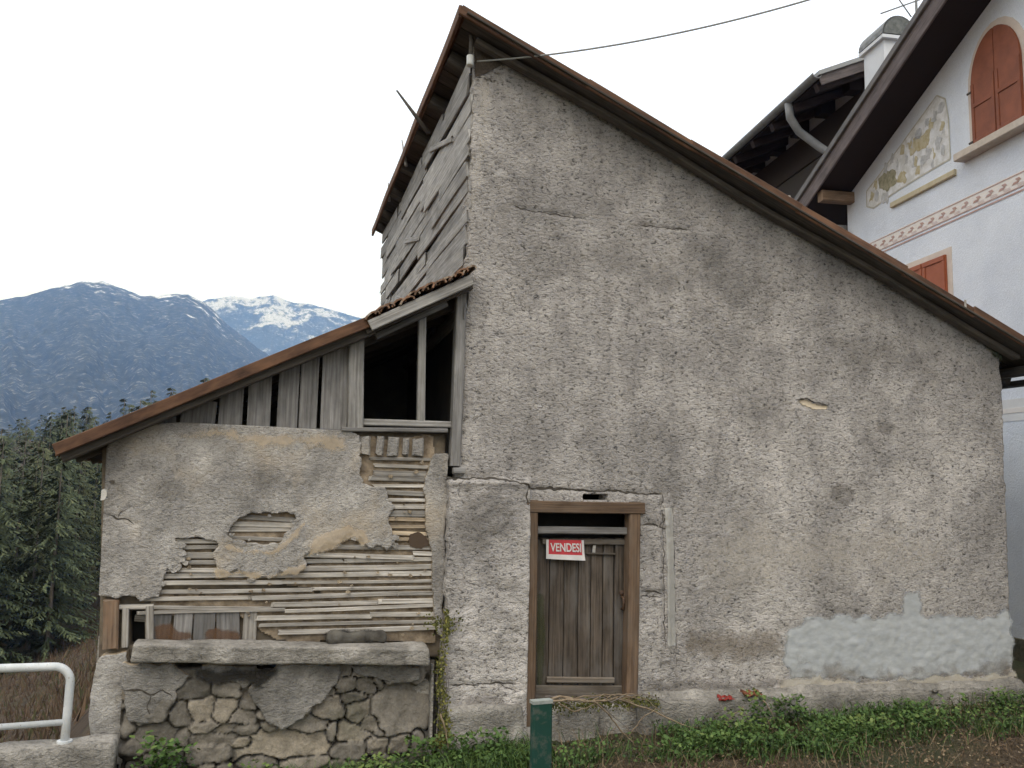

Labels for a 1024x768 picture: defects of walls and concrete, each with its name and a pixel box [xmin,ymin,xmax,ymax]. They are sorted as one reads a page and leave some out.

crack [512,204,582,219]
flaking render [797,398,827,409]
peeling [137,435,436,643]
crack [444,476,677,664]